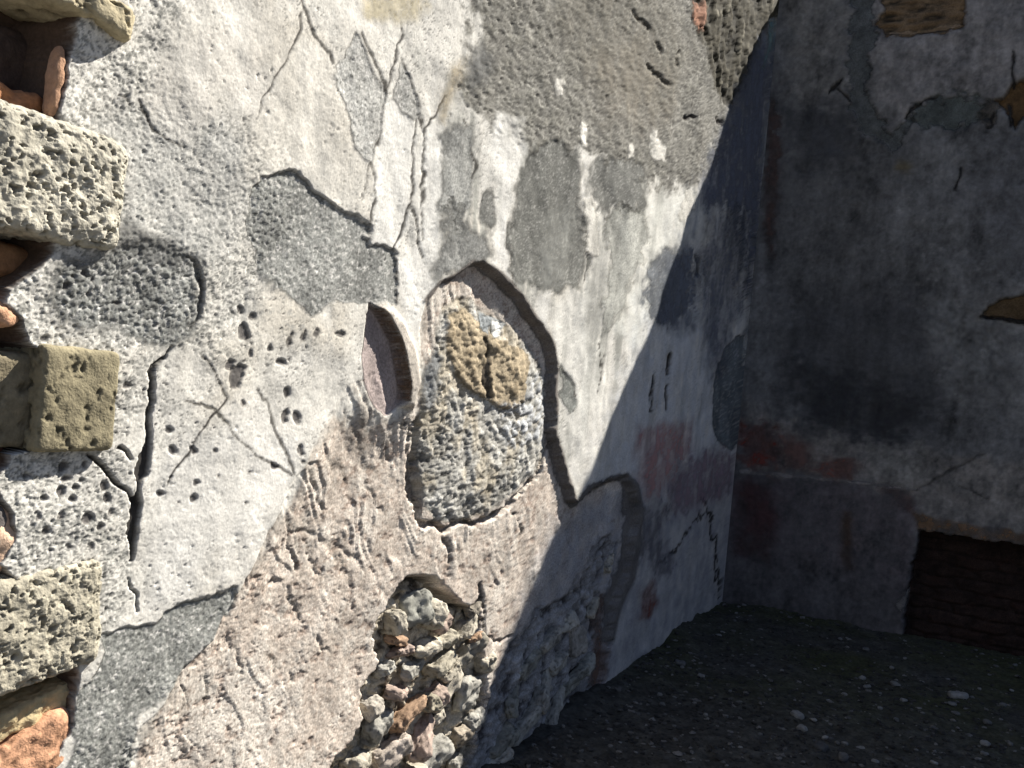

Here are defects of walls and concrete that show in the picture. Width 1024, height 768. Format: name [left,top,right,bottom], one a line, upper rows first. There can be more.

crack [259,0,334,112]
crack [361,28,413,108]
peeling [845,0,1024,153]
crack [365,133,381,234]
crack [393,96,445,305]
spalling [979,295,1024,324]
spalling [41,462,86,500]
crack [87,348,295,560]
peeling [50,122,692,768]
peeling [713,335,746,450]
crack [661,501,721,598]